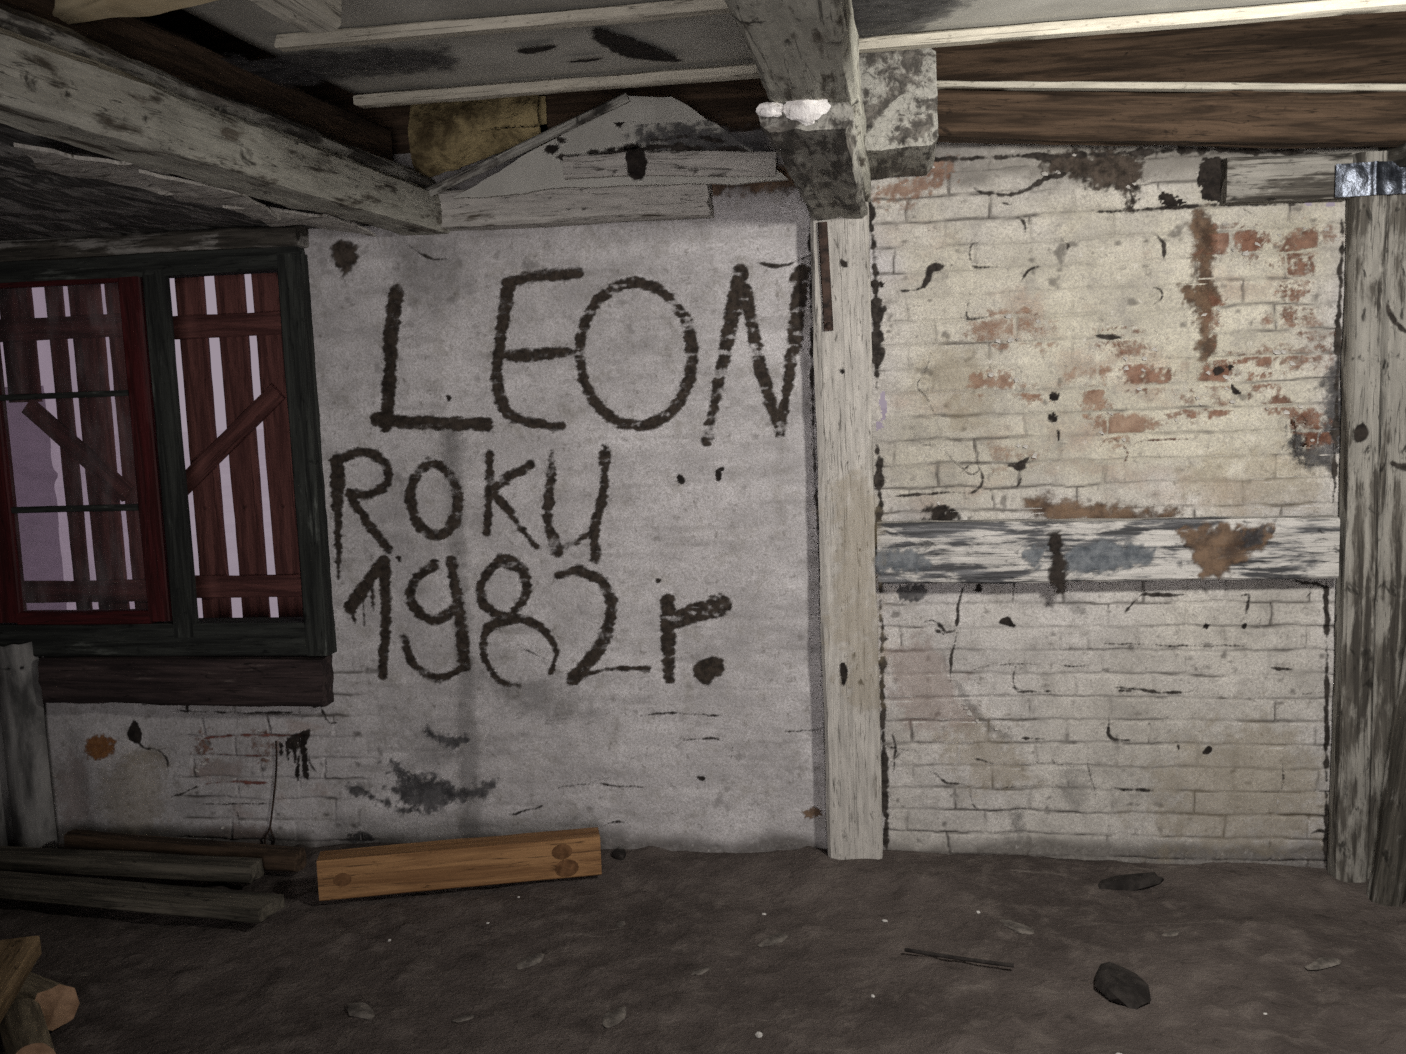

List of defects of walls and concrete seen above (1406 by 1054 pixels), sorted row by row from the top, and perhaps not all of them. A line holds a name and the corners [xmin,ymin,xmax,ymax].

spalling [1038,147,1144,211]
spalling [1159,157,1223,209]
corrosion [1181,209,1221,361]
peeling [973,307,1050,349]
peeling [1080,223,1340,447]
peeling [968,372,1060,441]
leakage [349,786,412,813]
leakage [386,758,410,781]
leakage [447,781,496,803]